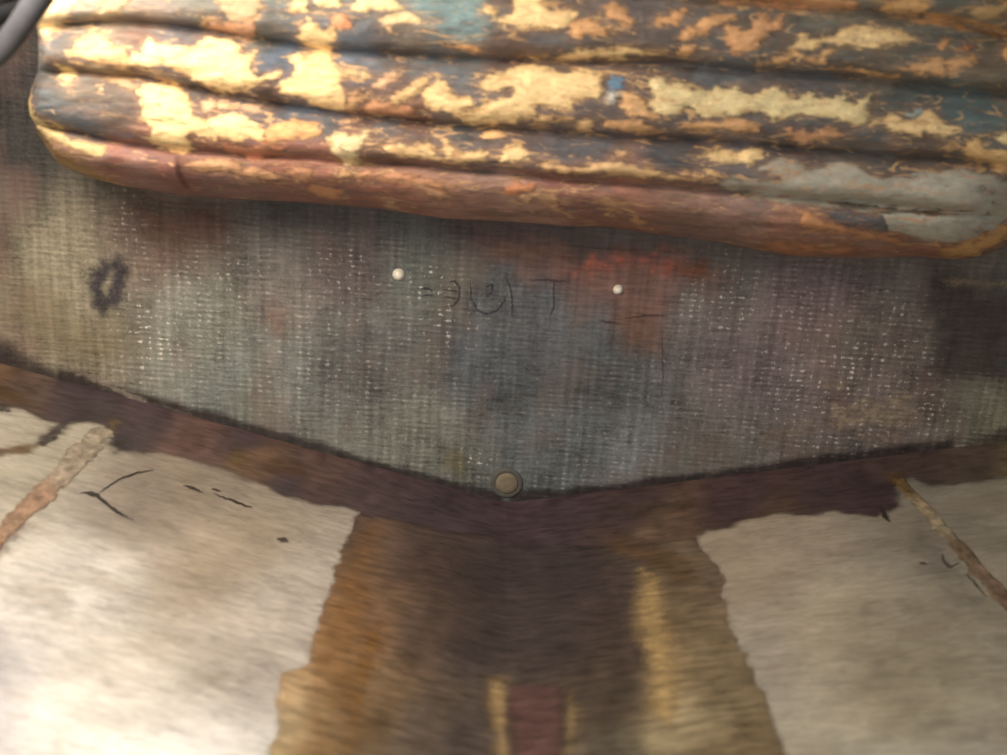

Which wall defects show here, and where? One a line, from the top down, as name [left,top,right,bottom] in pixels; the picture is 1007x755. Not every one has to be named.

peeling [36,0,81,41]
peeling [29,96,119,183]
peeling [53,0,1007,257]
rust [0,430,67,457]
crack [81,469,154,520]
water stain [263,484,787,755]